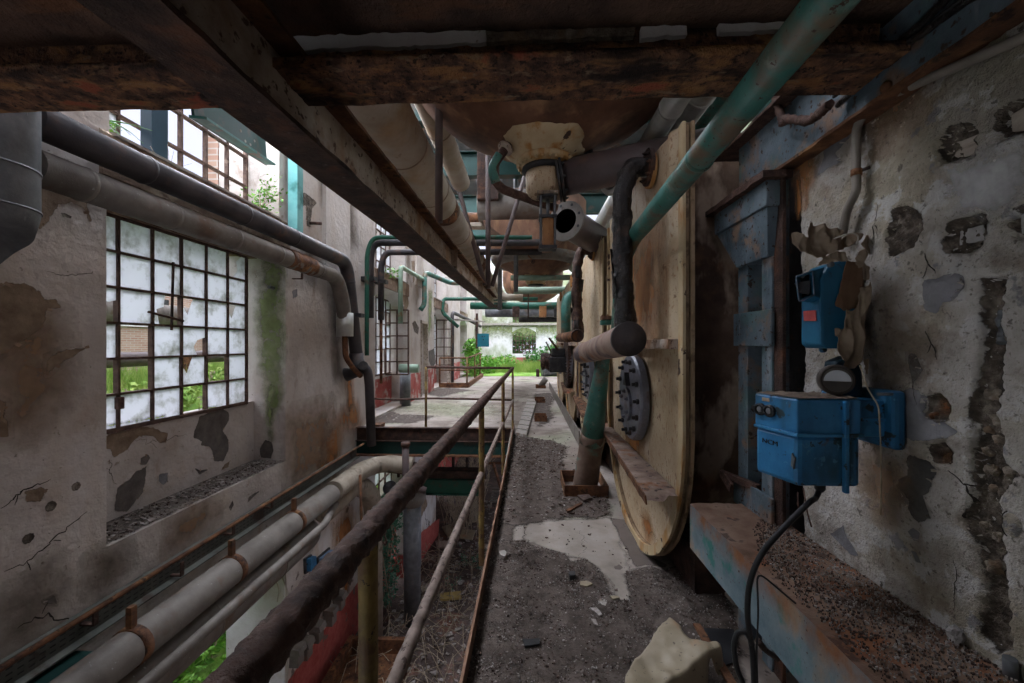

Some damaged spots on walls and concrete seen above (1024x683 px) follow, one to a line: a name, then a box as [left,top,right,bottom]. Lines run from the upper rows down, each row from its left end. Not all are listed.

spalling [885,206,924,258]
peeling [922,270,964,314]
crack [0,480,49,509]
peeling [106,409,284,543]
peeling [896,354,957,563]
crack [4,512,86,572]